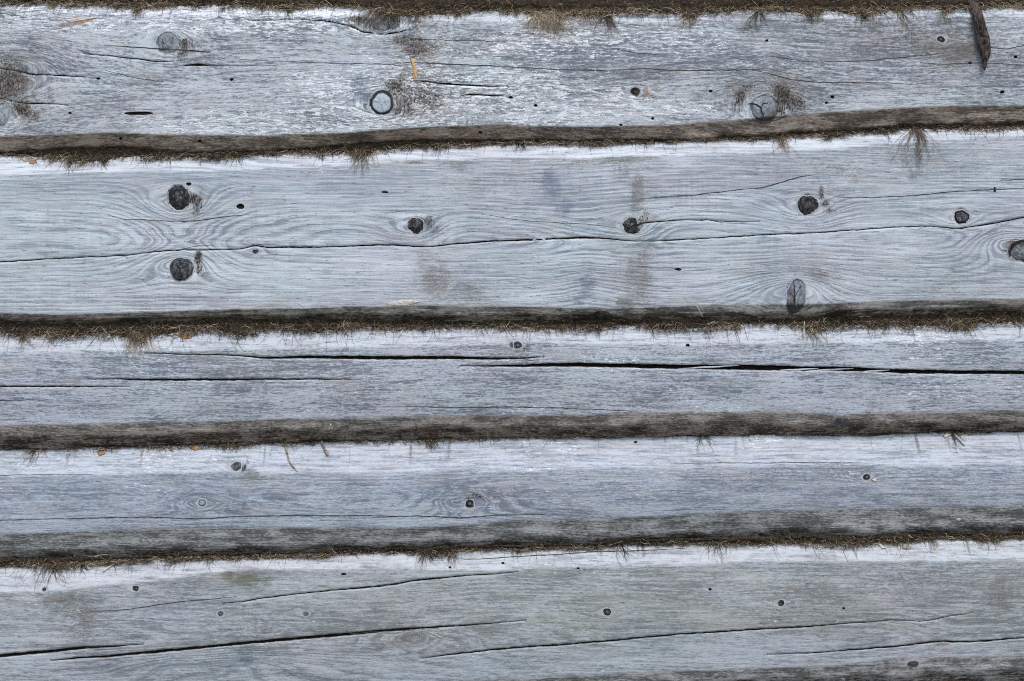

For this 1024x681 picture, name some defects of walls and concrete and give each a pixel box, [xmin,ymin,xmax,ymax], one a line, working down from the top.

crack [0,175,1024,265]
crack [0,351,1024,401]
crack [107,548,685,611]
crack [0,610,1024,664]